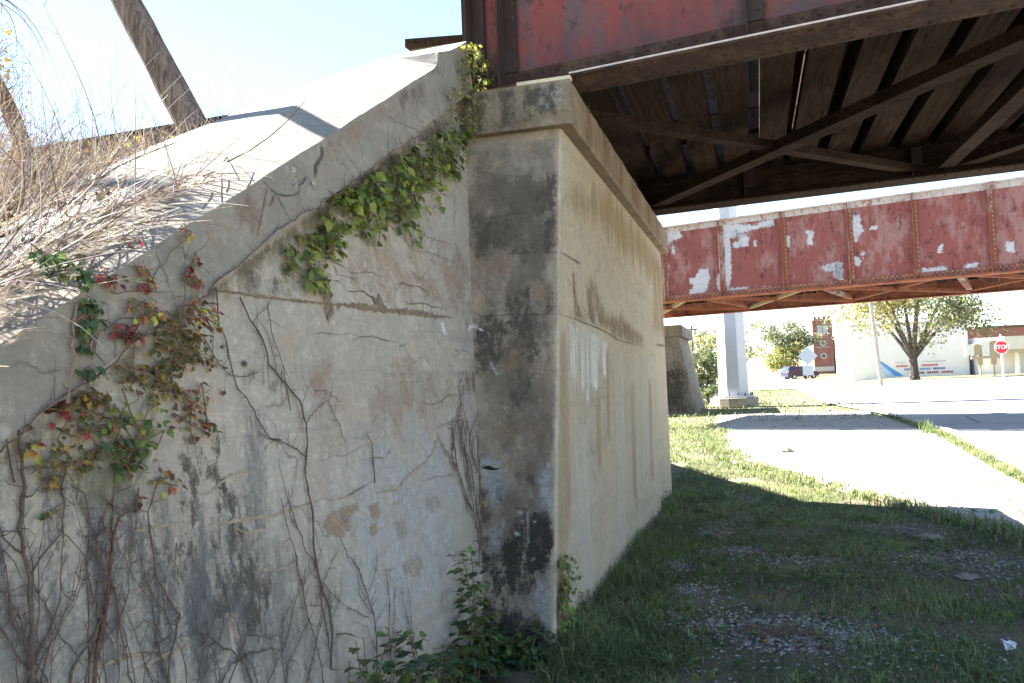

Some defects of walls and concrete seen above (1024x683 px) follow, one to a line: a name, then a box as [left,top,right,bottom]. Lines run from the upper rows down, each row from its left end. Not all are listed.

crack [208,234,664,346]
water stain [468,286,553,406]
water stain [570,326,607,406]
peeling [667,231,683,275]
peeling [689,219,775,294]
peeling [821,214,878,280]
water stain [141,434,295,683]
water stain [482,472,553,647]